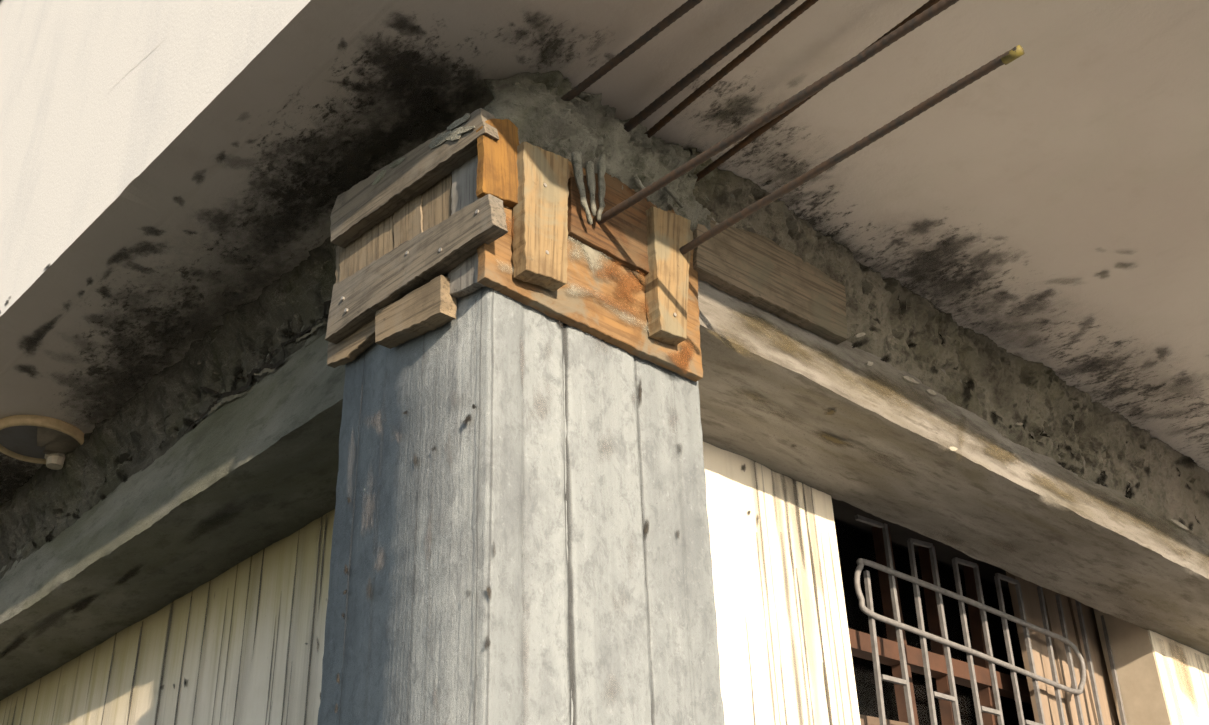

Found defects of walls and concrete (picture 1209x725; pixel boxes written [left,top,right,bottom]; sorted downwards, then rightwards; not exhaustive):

mould [19,322,53,376]
mould [60,267,204,417]
mould [108,228,160,273]
spalling [0,236,337,580]
mould [208,17,483,259]
mould [787,185,851,238]
spalling [596,0,1209,545]
leakage [865,223,1175,426]